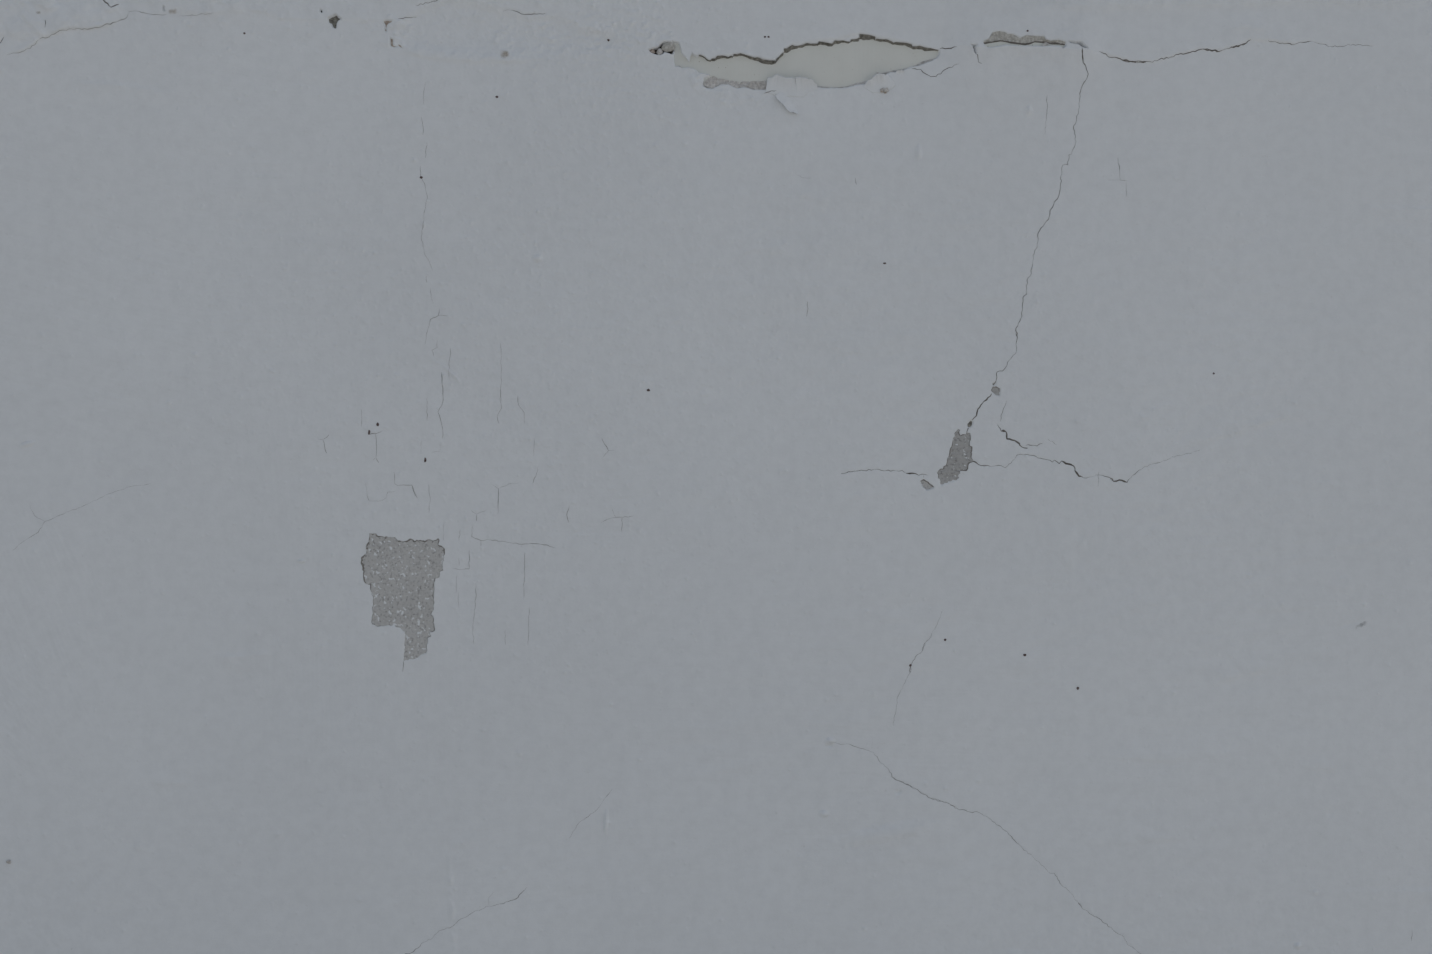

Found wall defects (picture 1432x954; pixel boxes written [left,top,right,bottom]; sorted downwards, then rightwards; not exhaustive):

flaking render [650,42,675,55]
spalling [699,34,939,65]
crack [967,40,1369,483]
peeling [921,421,973,490]
peeling [361,533,445,661]